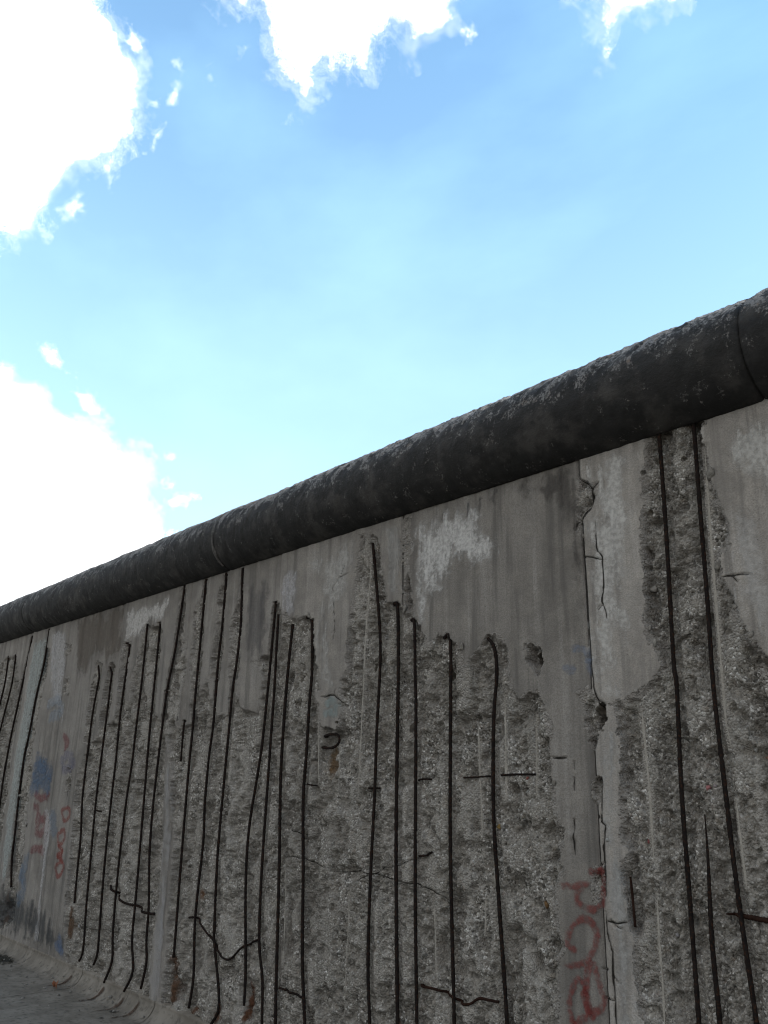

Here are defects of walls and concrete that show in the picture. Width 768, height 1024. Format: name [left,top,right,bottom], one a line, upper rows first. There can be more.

spalling [62,516,568,1024]
crack [576,472,607,707]
spalling [575,420,768,1024]